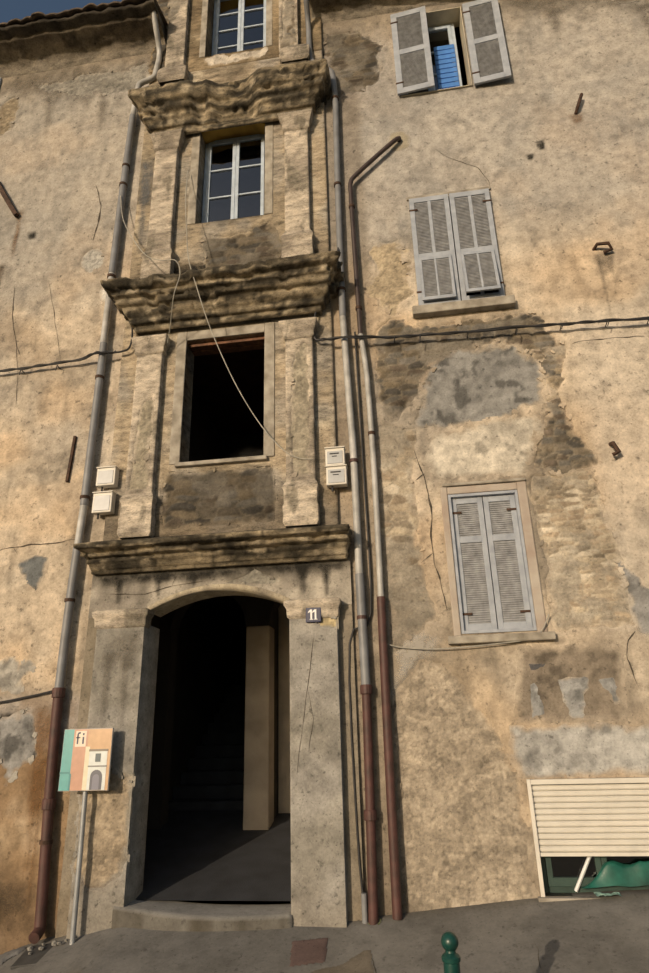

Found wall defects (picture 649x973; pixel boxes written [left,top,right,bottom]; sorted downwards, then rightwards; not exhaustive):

spalling [364,239,649,653]
peeling [0,708,38,787]